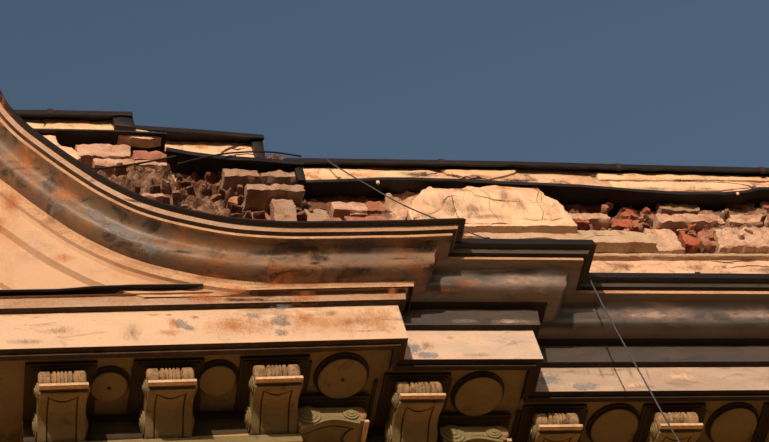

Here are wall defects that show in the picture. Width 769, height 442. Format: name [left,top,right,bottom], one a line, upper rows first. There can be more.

spalling [43,135,271,220]
flaking render [595,172,769,192]
crack [443,169,471,218]
peeling [86,209,169,260]
spalling [564,201,769,254]
leakage [254,240,300,255]
leakage [334,238,372,253]
leakage [409,239,436,253]
crack [675,253,769,268]
leakage [341,267,371,275]